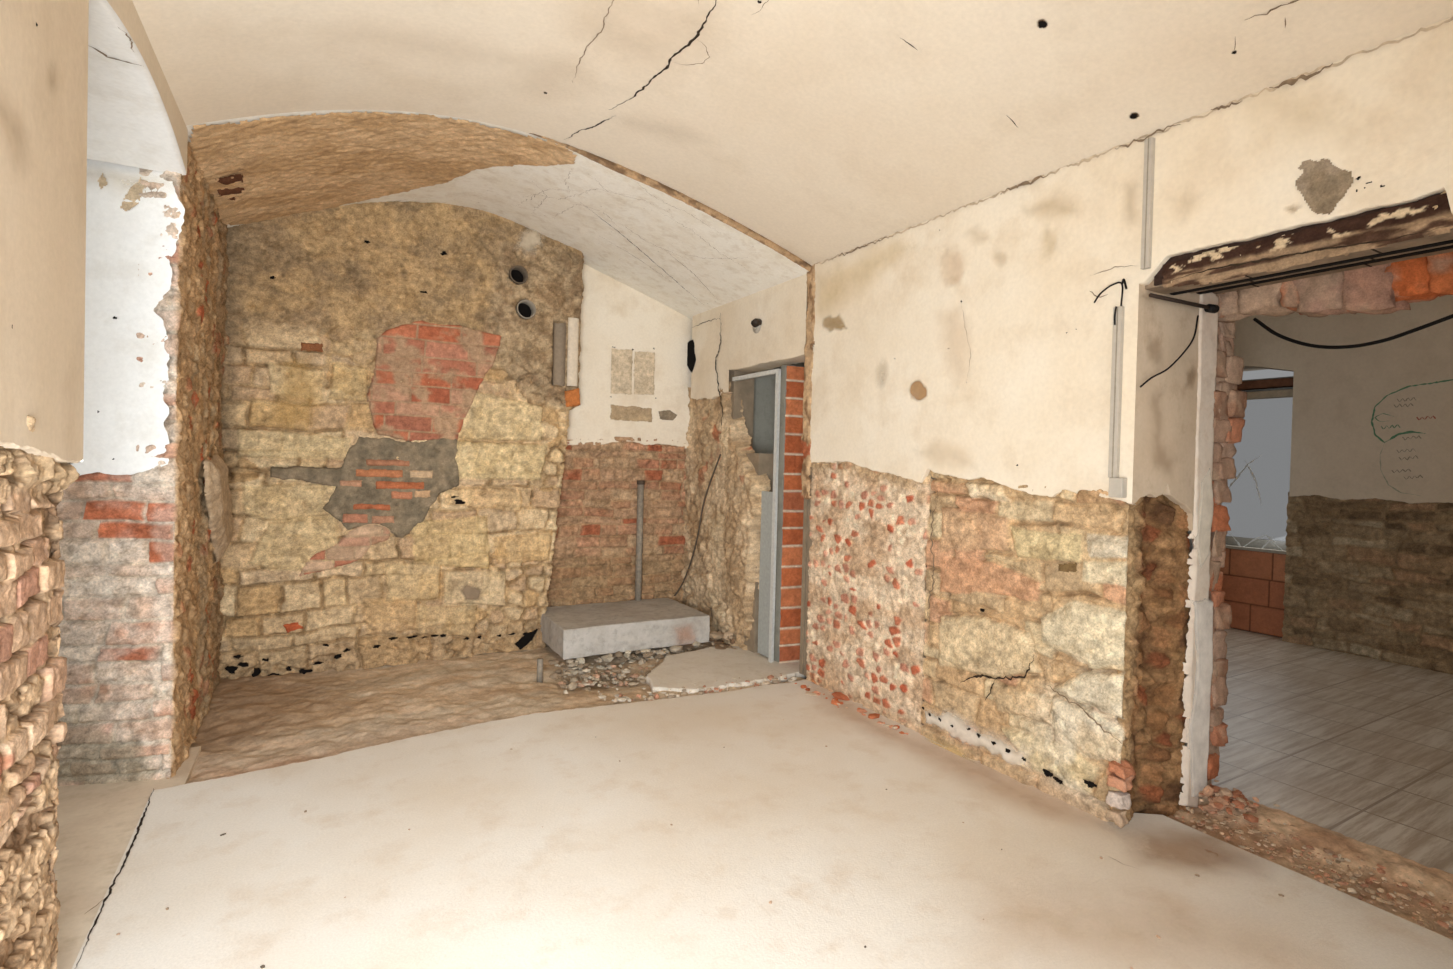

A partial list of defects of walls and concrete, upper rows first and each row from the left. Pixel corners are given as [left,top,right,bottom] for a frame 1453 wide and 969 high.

spalling [0,446,80,969]
crack [518,0,754,439]
spalling [188,111,1453,828]